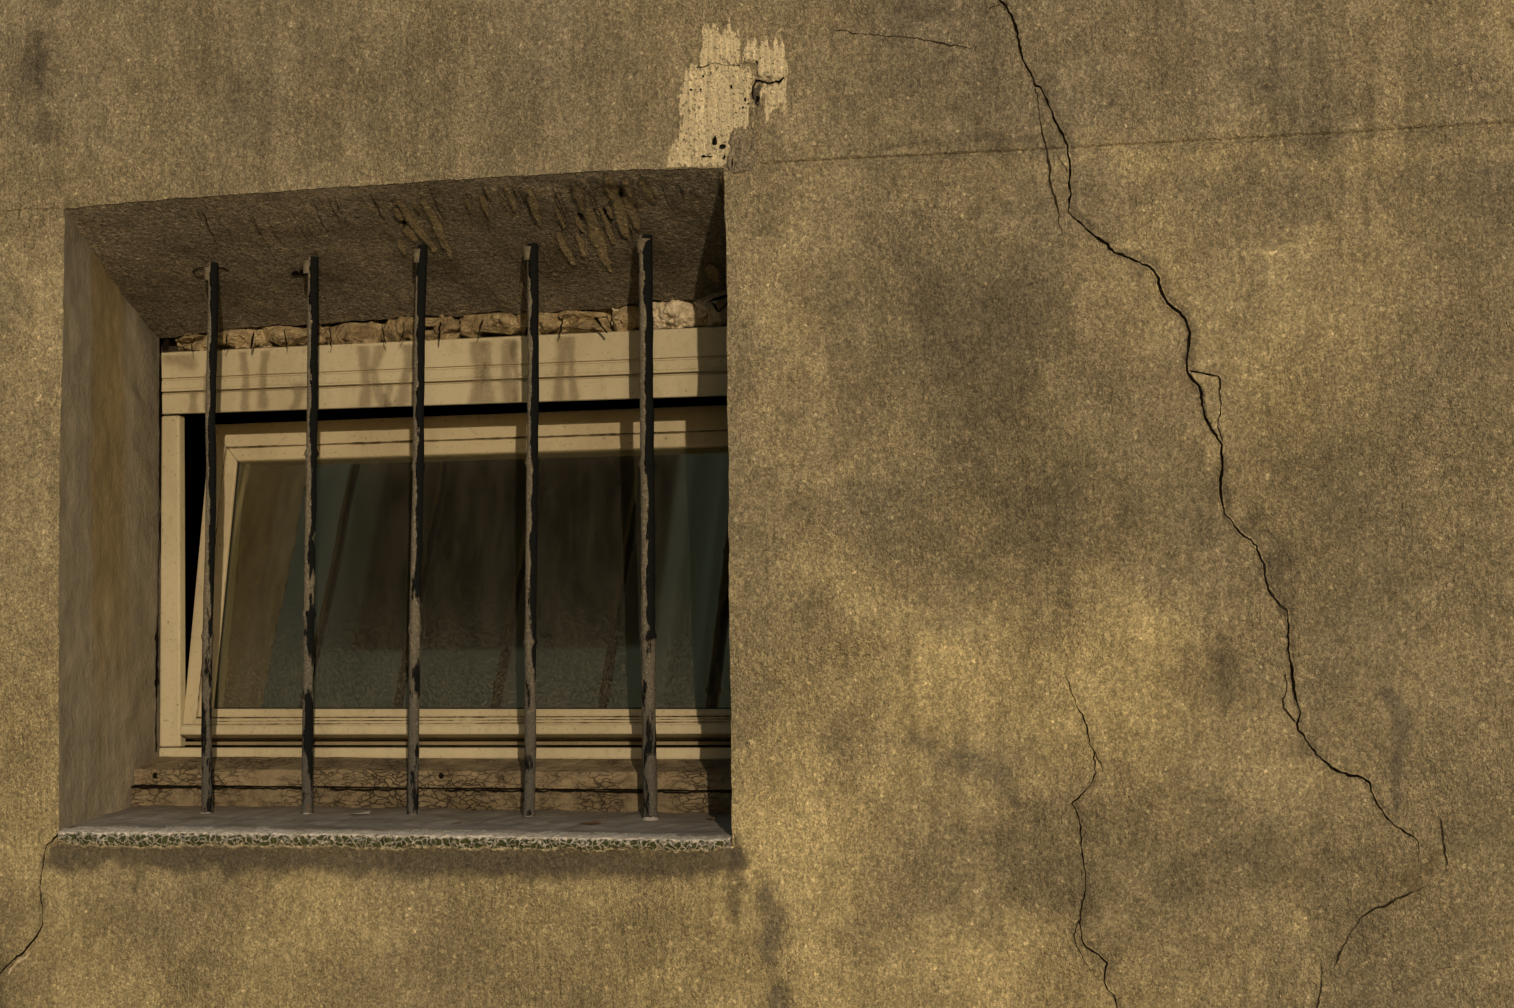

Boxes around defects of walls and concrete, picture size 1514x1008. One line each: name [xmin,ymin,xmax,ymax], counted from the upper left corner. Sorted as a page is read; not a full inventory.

spalling [666,18,791,173]
crack [832,29,978,49]
flaking render [160,289,727,354]
crack [989,0,1448,1008]
crack [0,832,58,976]